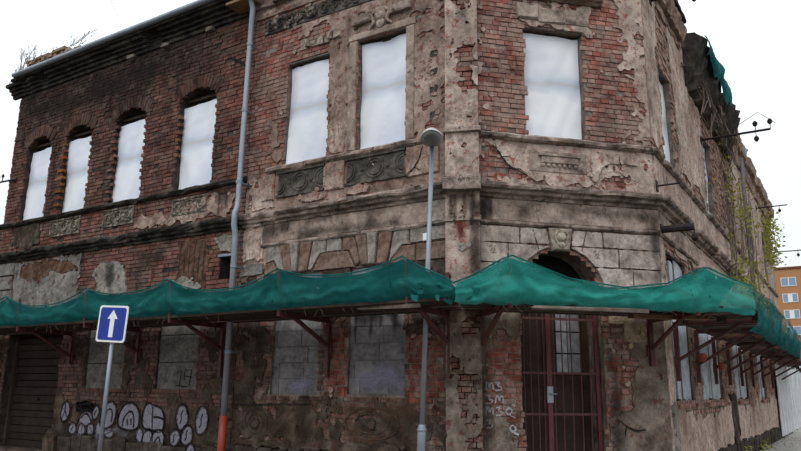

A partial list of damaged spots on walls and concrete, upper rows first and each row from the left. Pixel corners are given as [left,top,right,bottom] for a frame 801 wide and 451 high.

spalling [426,49,438,96]
crack [494,143,529,177]
flaking render [133,192,236,229]
flaking render [214,234,232,252]
flaking render [240,228,265,277]
flaking render [13,253,84,307]
flaking render [92,261,128,295]
flaking render [608,316,647,349]
crack [620,421,647,437]